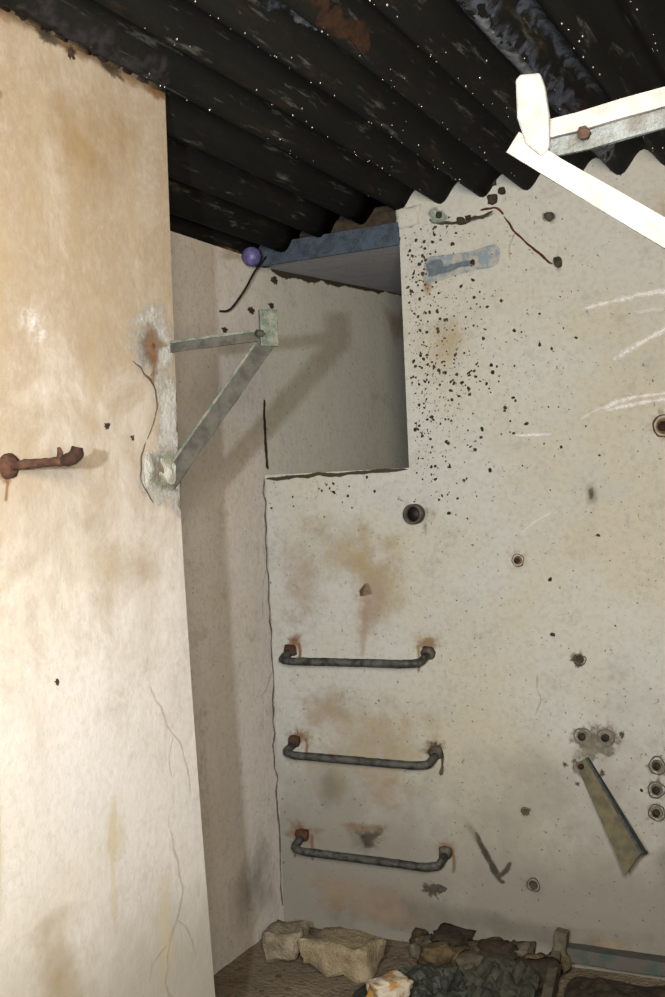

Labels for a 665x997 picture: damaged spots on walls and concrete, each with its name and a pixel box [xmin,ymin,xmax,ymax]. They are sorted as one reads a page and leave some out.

rust [141,339,166,382]
leakage [405,216,526,520]